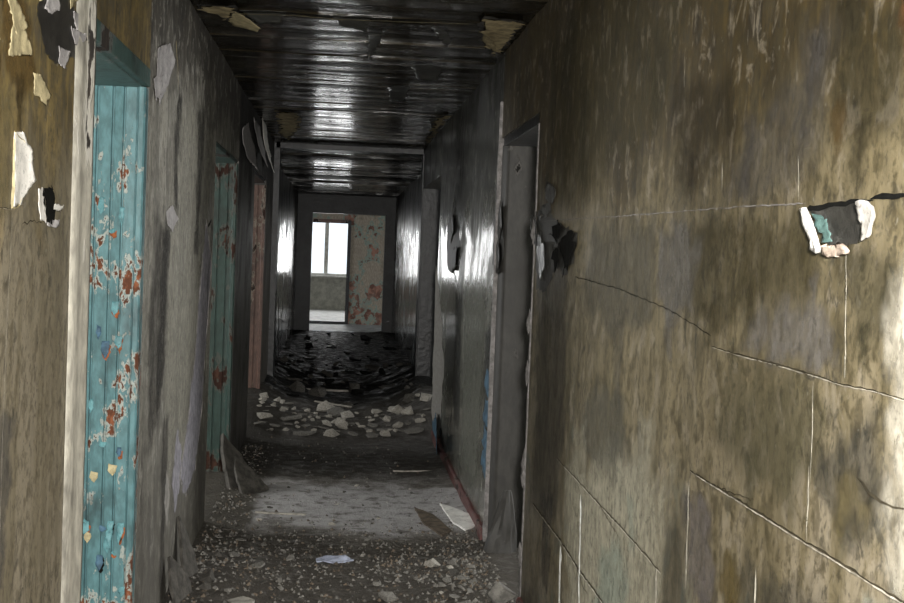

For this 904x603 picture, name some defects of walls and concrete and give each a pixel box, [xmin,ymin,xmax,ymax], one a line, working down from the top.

peeling [9,20,33,57]
peeling [33,72,52,105]
peeling [37,0,87,69]
peeling [477,16,525,64]
peeling [11,131,64,228]
spalling [799,199,876,257]
crack [871,192,904,200]
peeling [517,123,578,597]
crack [577,277,904,401]
leakage [886,282,904,588]
leakage [565,396,663,603]
crack [690,470,904,603]